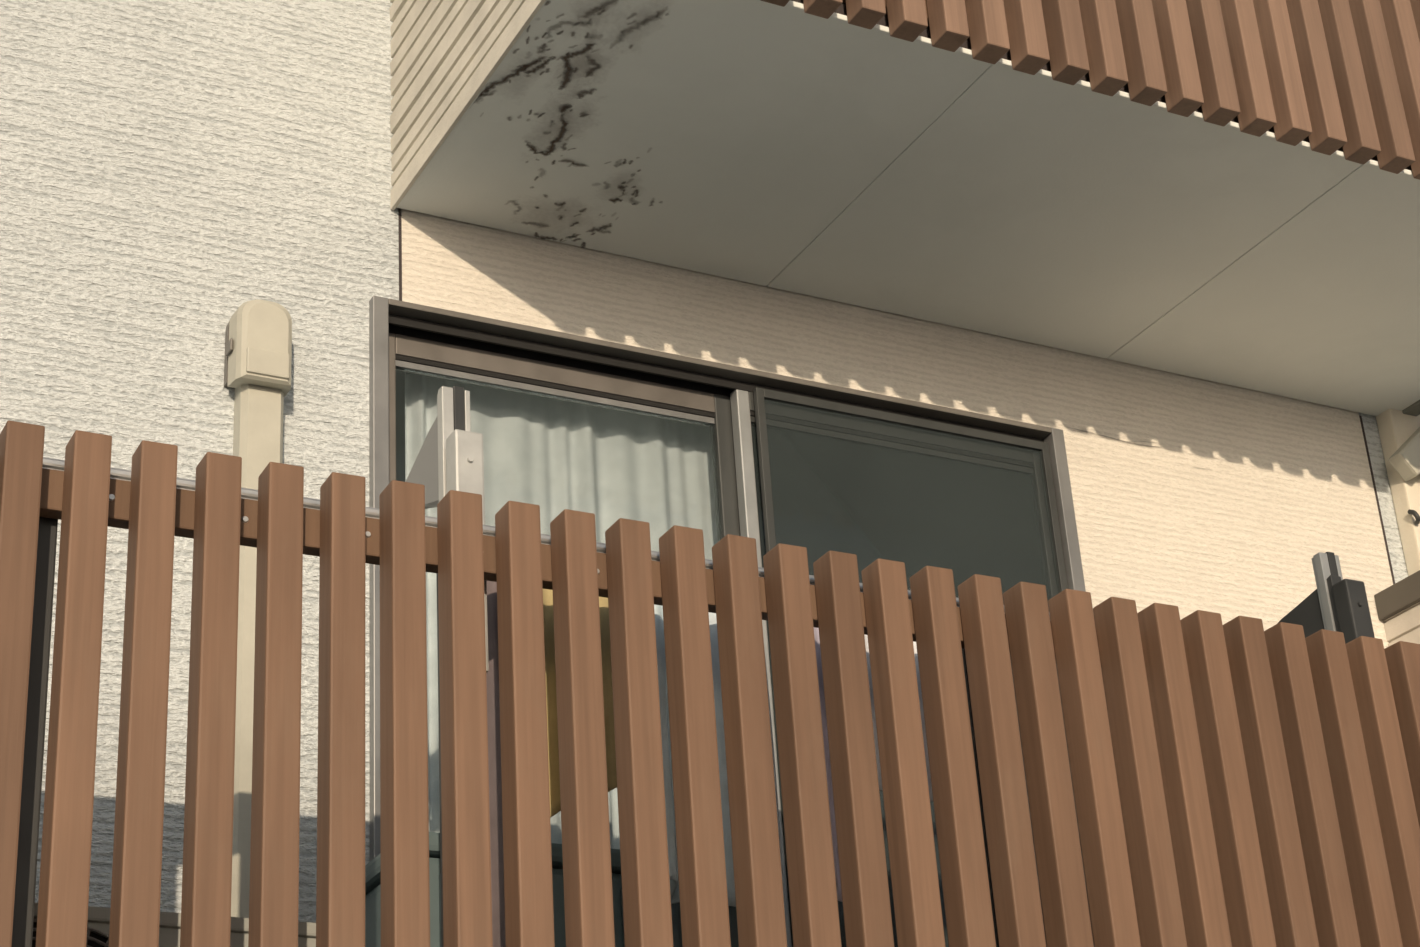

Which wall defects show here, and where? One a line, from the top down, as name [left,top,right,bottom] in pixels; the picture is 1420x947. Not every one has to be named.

leakage [535,209,611,248]